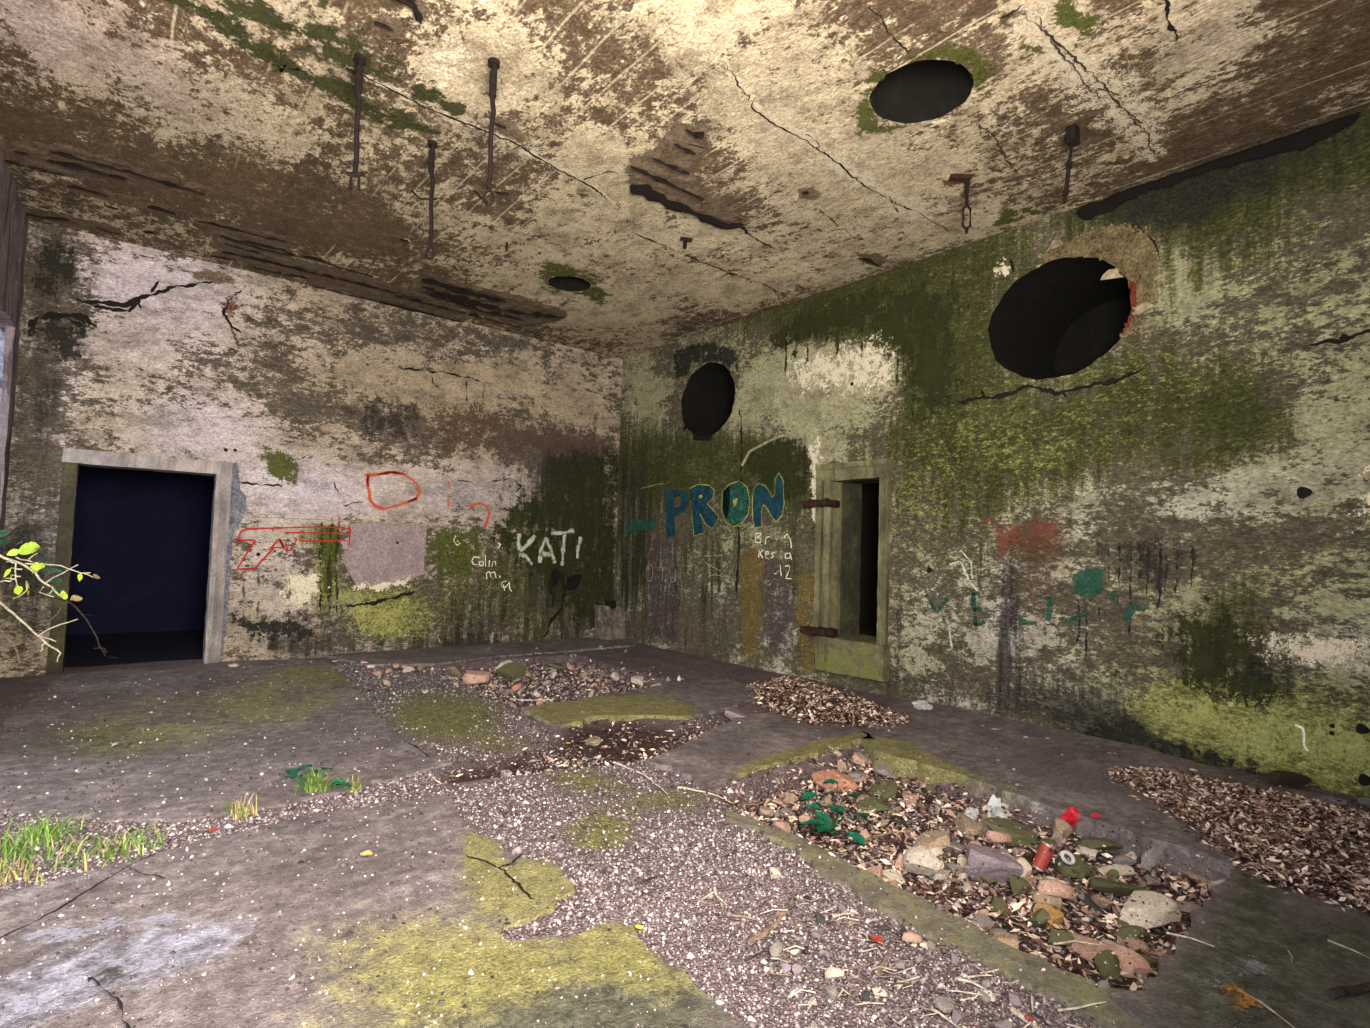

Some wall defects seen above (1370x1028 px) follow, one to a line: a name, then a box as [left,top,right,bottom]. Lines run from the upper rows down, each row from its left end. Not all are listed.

peeling [365,0,488,91]
crack [1164,0,1178,41]
spalling [623,120,746,230]
spalling [0,139,568,328]
crack [28,281,242,337]
water stain [766,271,969,423]
crack [953,368,1144,404]
crack [1305,329,1370,346]
peeling [1344,465,1370,533]
water stain [647,538,681,644]
water stain [1096,531,1303,715]
water stain [1072,701,1261,774]